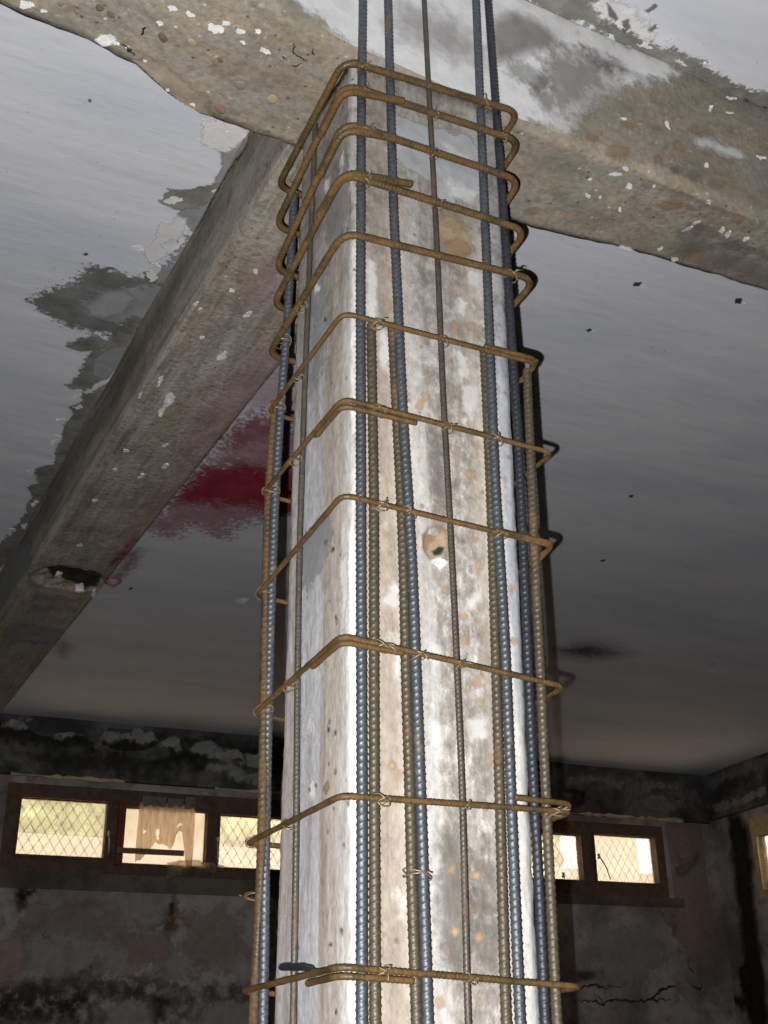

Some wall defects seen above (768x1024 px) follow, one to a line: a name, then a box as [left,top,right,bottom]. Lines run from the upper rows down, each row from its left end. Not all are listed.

spalling [532,0,768,114]
peeling [696,136,743,158]
peeling [132,196,188,282]
spalling [423,527,448,569]
spalling [28,563,106,600]
water stain [0,722,259,768]
water stain [272,751,284,773]
crack [576,943,703,1006]